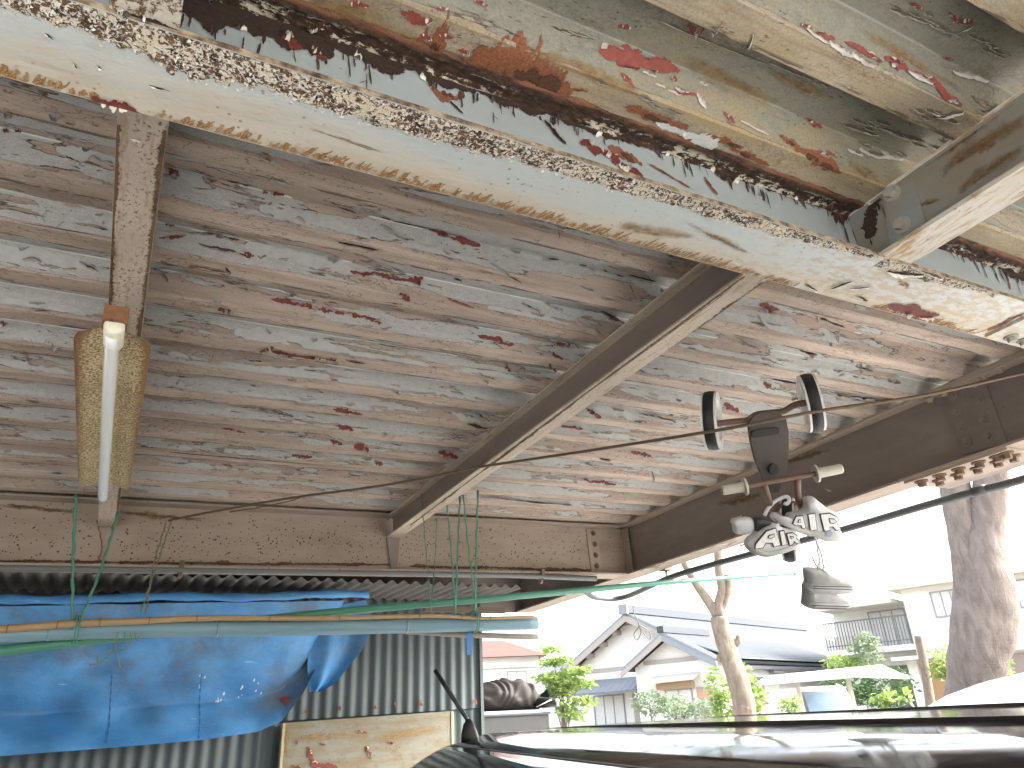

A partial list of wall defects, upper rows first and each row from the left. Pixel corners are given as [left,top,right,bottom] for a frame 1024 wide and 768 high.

rust [114,0,886,245]
peeling [0,0,1006,302]
rust [938,236,1024,295]
peeling [0,320,67,374]
peeling [176,298,541,430]
peeling [488,275,632,326]
peeling [723,303,794,333]
peeling [679,339,873,401]
peeling [888,304,940,322]
peeling [167,385,433,483]
peeling [561,404,685,467]
peeling [291,740,337,768]